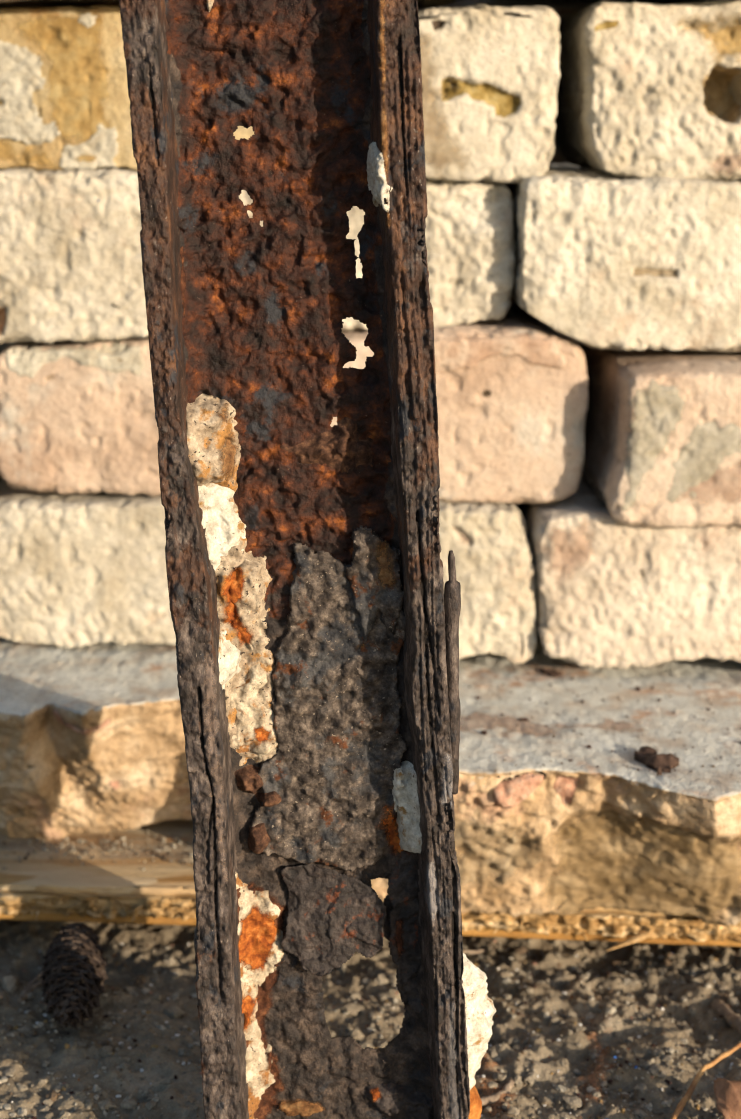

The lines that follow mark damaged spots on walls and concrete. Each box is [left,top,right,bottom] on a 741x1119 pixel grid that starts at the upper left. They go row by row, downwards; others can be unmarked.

peeling [78,12,98,27]
peeling [0,40,119,170]
rust [378,0,389,191]
spalling [442,77,521,118]
rust [219,403,238,483]
rust [280,417,373,473]
peeling [346,530,404,643]
rust [254,727,271,745]
rust [237,805,424,1013]
rust [246,963,324,1119]
rust [365,1083,434,1119]